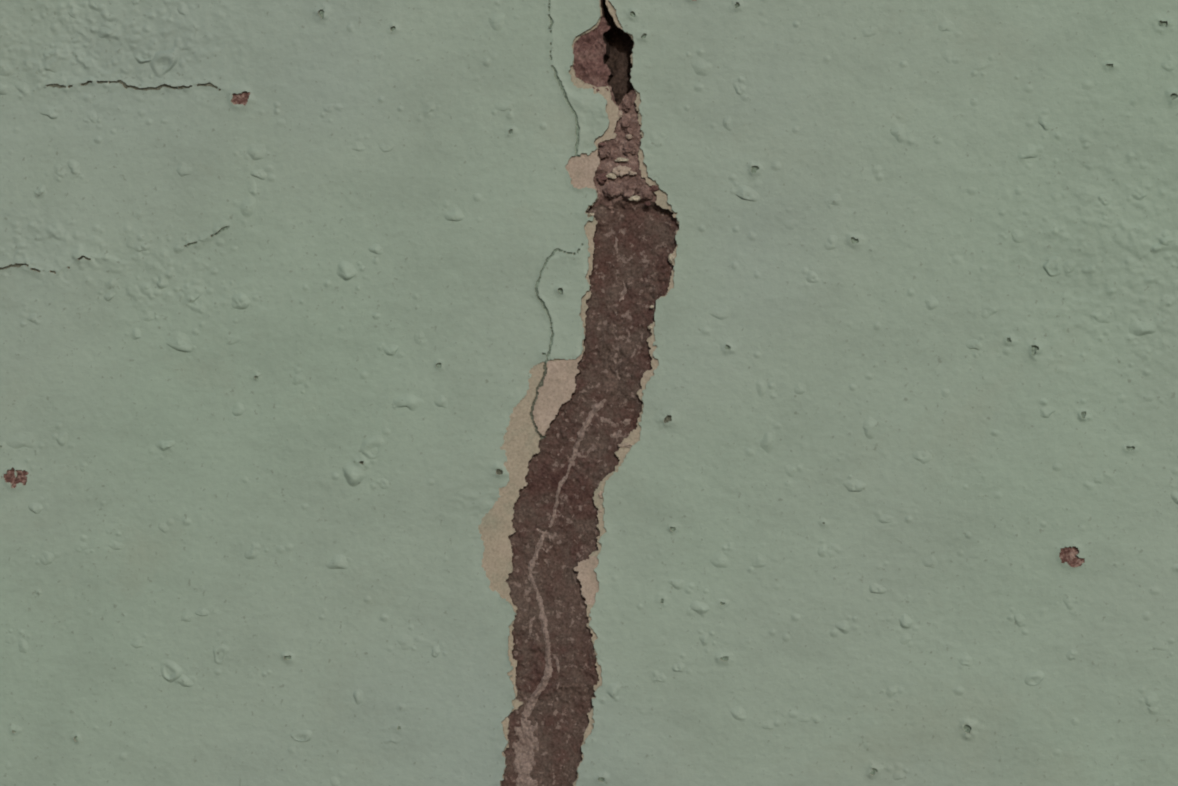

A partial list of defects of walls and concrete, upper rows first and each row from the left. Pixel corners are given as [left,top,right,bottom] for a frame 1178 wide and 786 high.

crack [47,80,221,91]
corrosion [232,91,250,106]
peeling [566,150,601,193]
crack [0,256,91,274]
crack [500,0,679,786]
corrosion [1,468,29,488]
peeling [478,353,583,595]
corrosion [1059,546,1085,567]
peeling [574,556,599,604]